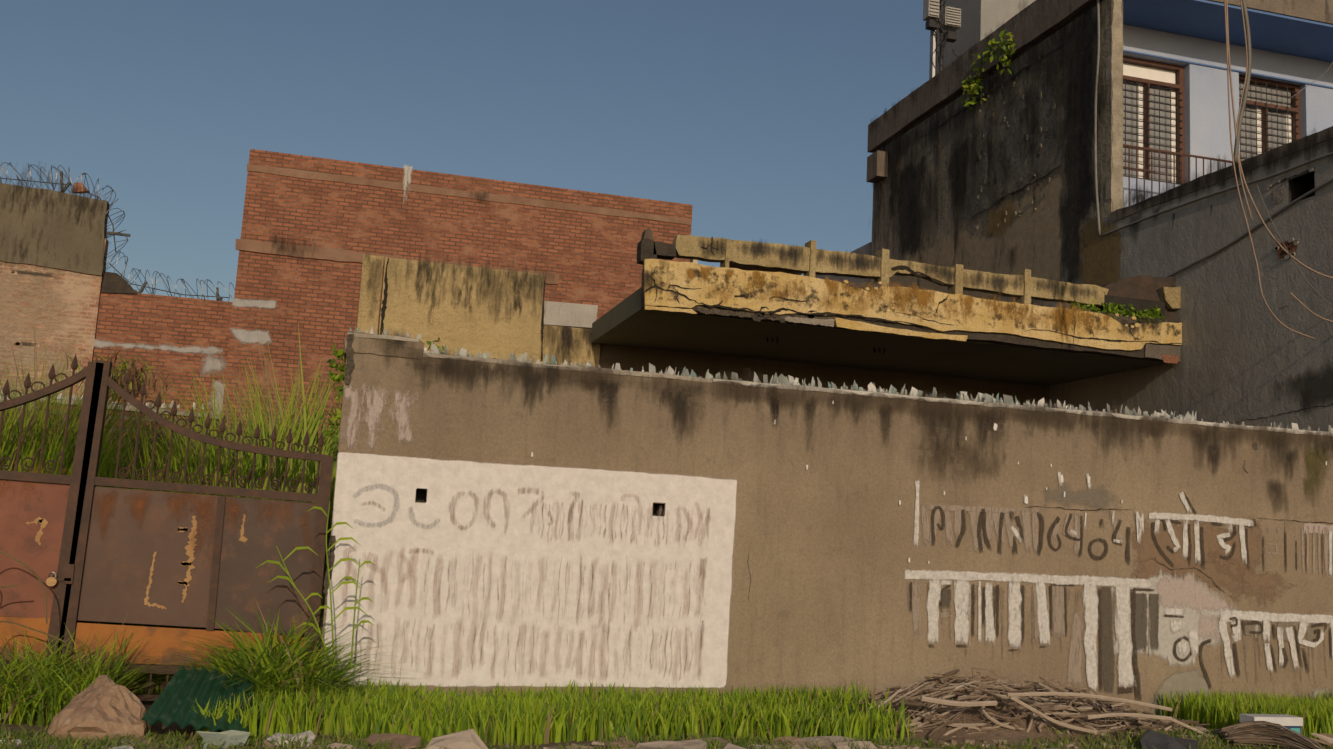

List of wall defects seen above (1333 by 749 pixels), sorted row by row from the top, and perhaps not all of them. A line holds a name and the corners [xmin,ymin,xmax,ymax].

water stain [874,9,1105,297]
spalling [1274,238,1299,260]
crack [380,258,389,335]
water stain [645,266,858,308]
crack [644,265,952,329]
water stain [971,250,1180,340]
water stain [512,327,617,416]
water stain [881,396,1009,466]
water stain [1095,407,1167,440]
water stain [1196,426,1332,492]
crack [1229,403,1333,423]
water stain [1299,366,1333,409]